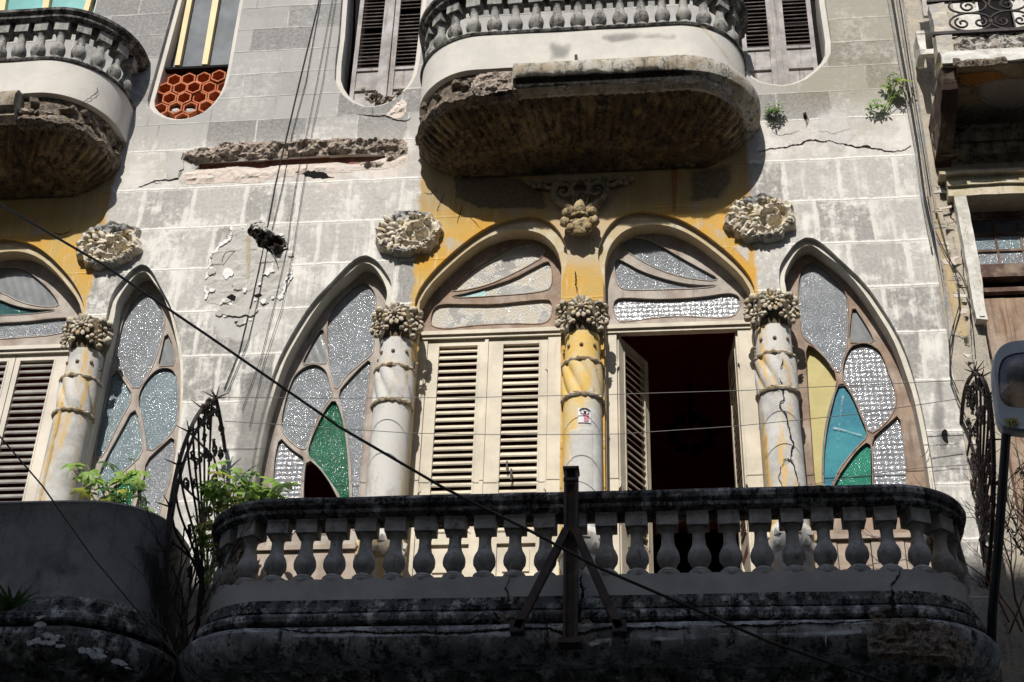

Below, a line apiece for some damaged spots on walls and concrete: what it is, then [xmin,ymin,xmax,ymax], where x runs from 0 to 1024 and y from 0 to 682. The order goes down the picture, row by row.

water stain [980,78,1024,109]
spalling [16,97,126,173]
spalling [166,71,518,184]
crack [759,117,911,152]
water stain [454,176,547,209]
flaking render [204,219,294,326]
crack [772,359,800,486]
crack [266,568,901,635]
efflorescence [764,630,862,642]